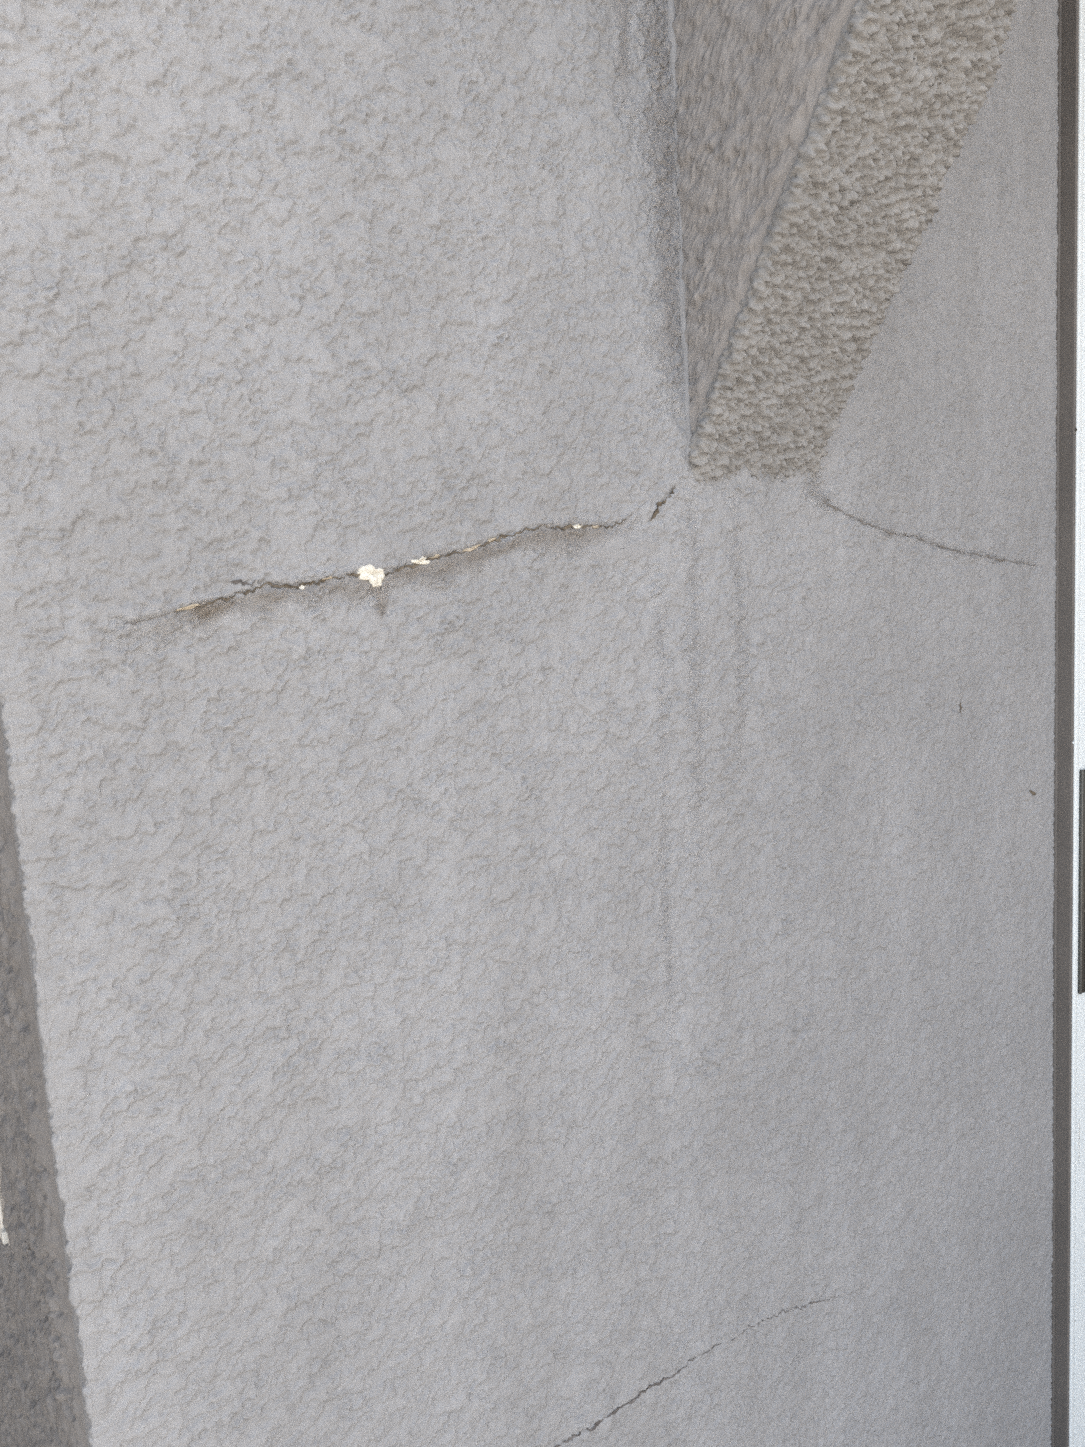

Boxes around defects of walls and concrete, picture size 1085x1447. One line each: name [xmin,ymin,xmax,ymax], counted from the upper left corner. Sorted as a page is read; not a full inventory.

crack [105,488,675,633]
crack [555,1293,851,1447]